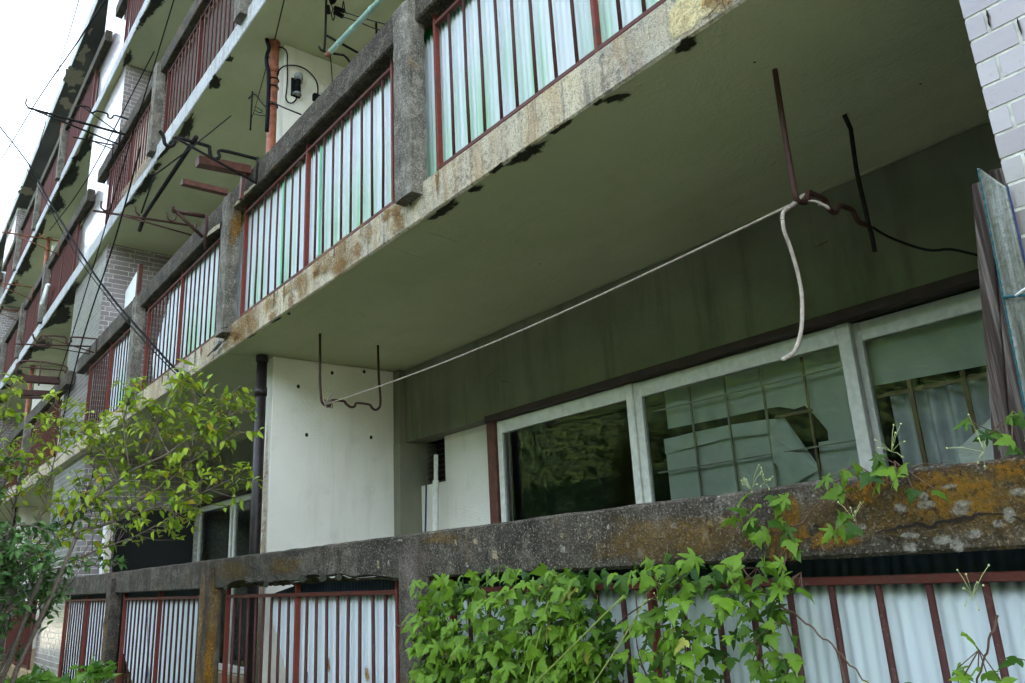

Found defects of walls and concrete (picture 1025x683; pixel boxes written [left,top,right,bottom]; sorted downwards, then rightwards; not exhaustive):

peeling [603,0,720,75]
water stain [674,36,697,54]
water stain [593,94,631,106]
water stain [468,119,573,193]
water stain [427,172,458,220]
crack [877,513,1025,533]